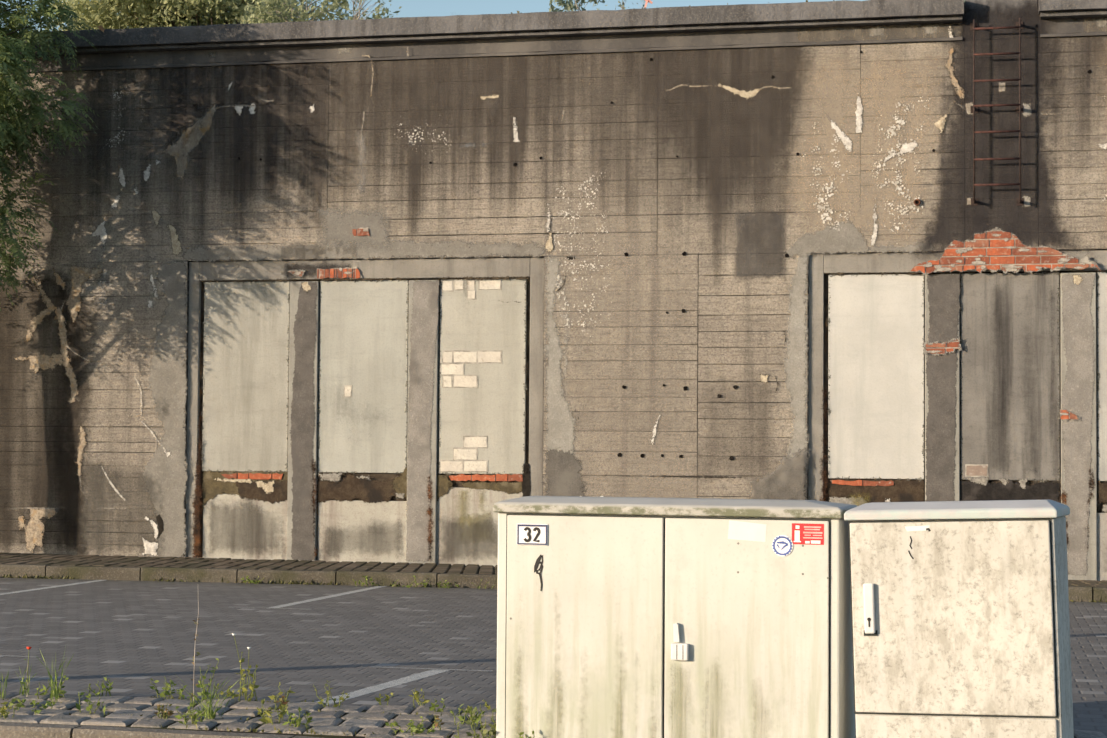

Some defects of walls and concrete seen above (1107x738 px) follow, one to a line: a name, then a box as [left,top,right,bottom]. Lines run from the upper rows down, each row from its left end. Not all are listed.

water stain [1080,19,1107,127]
water stain [89,47,527,223]
water stain [545,3,1068,251]
peeling [92,217,107,248]
peeling [151,210,183,255]
peeling [45,263,103,322]
flaking render [909,227,1107,575]
flaking render [829,480,895,506]
spalling [18,507,57,553]
water stain [231,505,265,553]
water stain [325,529,341,554]
water stain [445,523,498,558]